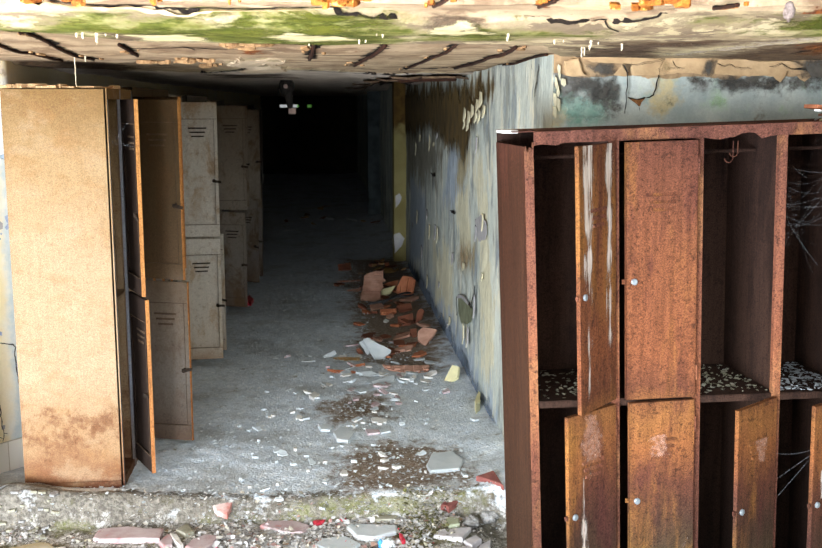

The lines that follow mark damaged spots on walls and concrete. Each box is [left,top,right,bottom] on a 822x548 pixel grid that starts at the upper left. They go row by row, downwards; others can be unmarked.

spalling [0,32,104,62]